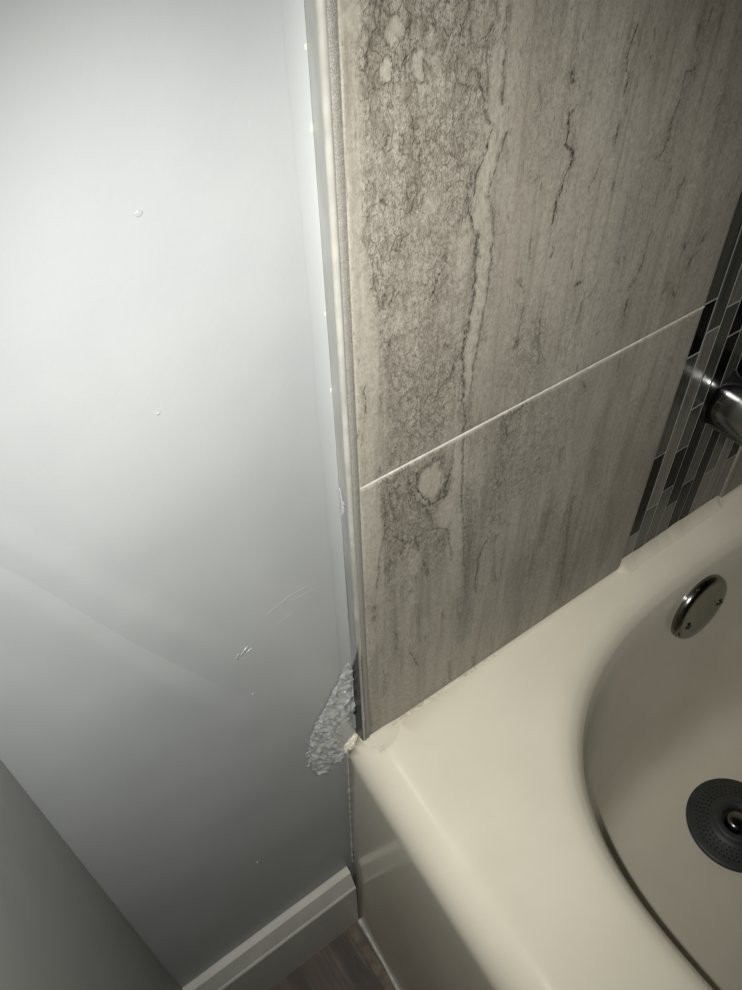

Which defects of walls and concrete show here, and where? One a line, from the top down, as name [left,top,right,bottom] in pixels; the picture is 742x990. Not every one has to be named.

peeling [305,663,355,776]